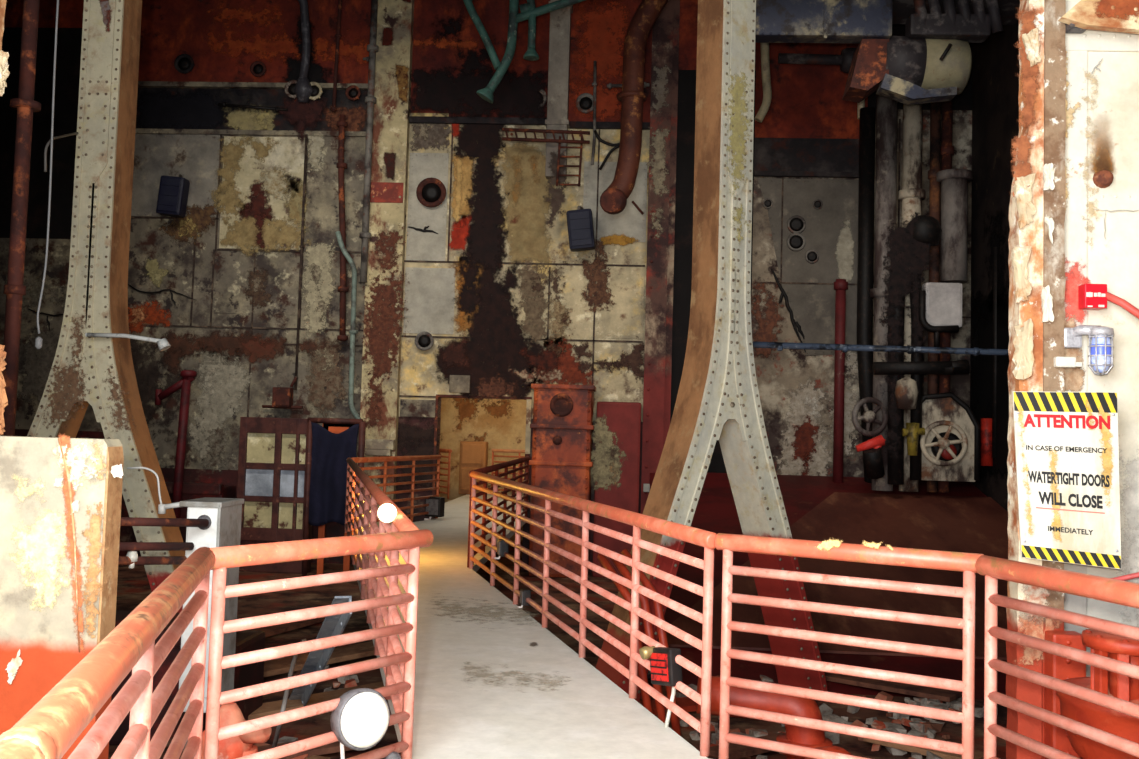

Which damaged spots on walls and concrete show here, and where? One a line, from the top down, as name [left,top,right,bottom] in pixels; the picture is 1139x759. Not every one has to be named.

rust [1095,0,1139,22]
peeling [0,328,60,436]
peeling [24,277,67,311]
peeling [10,440,123,612]
rust [43,313,108,651]
rust [128,300,347,418]
peeling [159,105,336,334]
rust [360,227,409,429]
rust [383,152,396,181]
rust [395,114,645,494]
rust [791,416,819,476]
rust [1011,9,1040,197]